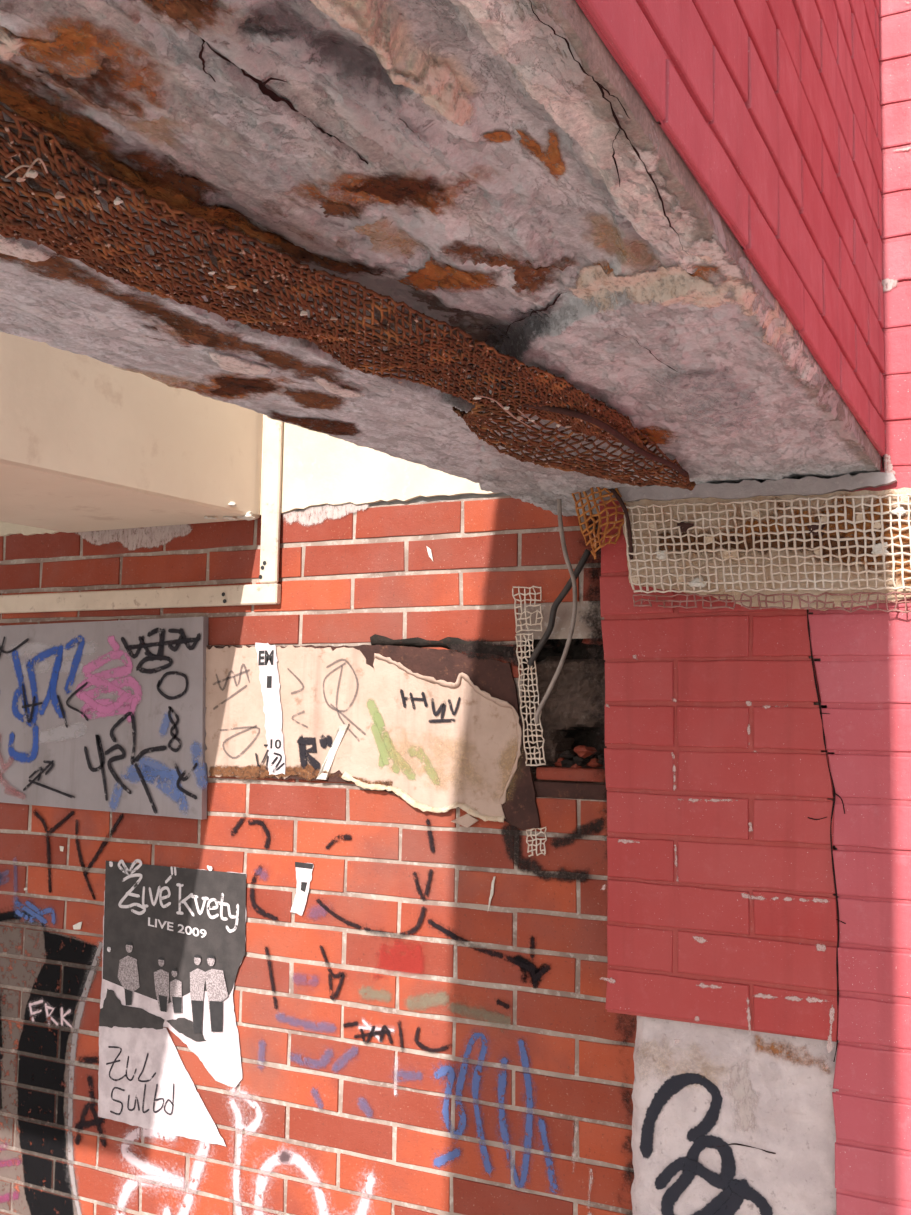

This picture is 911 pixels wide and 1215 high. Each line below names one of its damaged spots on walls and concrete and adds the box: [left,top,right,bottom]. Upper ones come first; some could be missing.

corrosion [143,0,218,32]
crack [199,37,368,165]
crack [310,41,426,143]
spalling [310,0,473,126]
crack [529,0,689,255]
peeling [0,234,50,262]
corrosion [0,20,696,560]
corrosion [689,266,716,281]
peeling [208,352,270,376]
spalling [270,410,360,436]
peeling [205,634,609,828]
crack [807,609,846,1062]